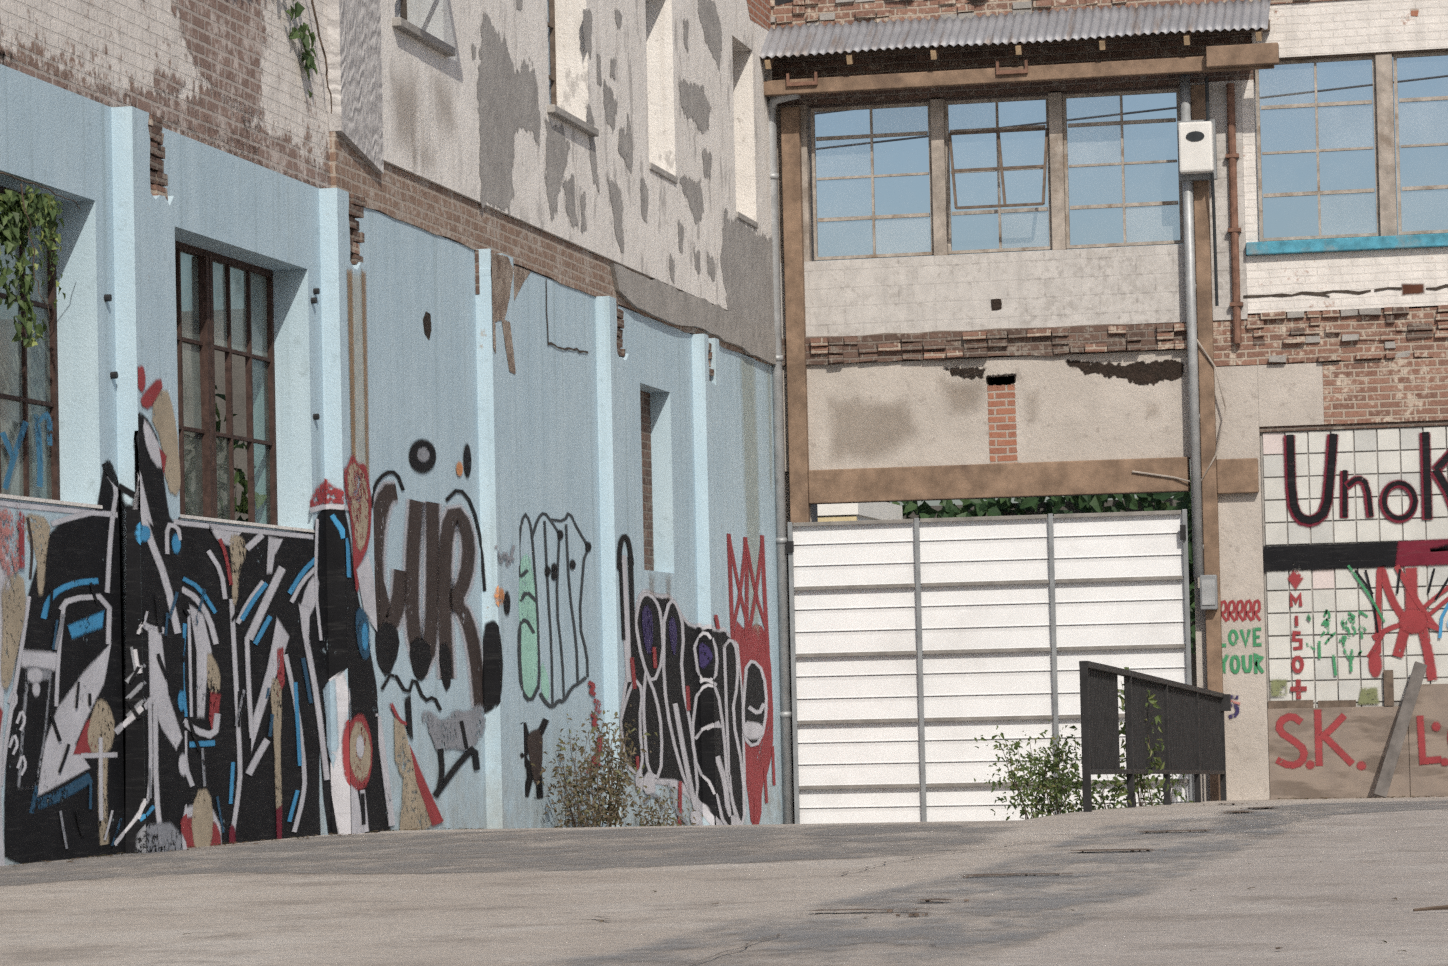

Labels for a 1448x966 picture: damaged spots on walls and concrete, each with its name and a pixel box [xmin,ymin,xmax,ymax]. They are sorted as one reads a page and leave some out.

flaking render [683,0,723,71]
peeling [0,0,331,200]
flaking render [472,8,648,253]
spalling [349,192,366,264]
flaking render [670,79,775,330]
flaking render [423,311,432,339]
flaking render [475,250,531,374]
spalling [616,300,625,357]
spalling [991,299,1002,311]
crack [1243,284,1448,298]
spalling [1246,305,1448,363]
spalling [810,323,1198,464]